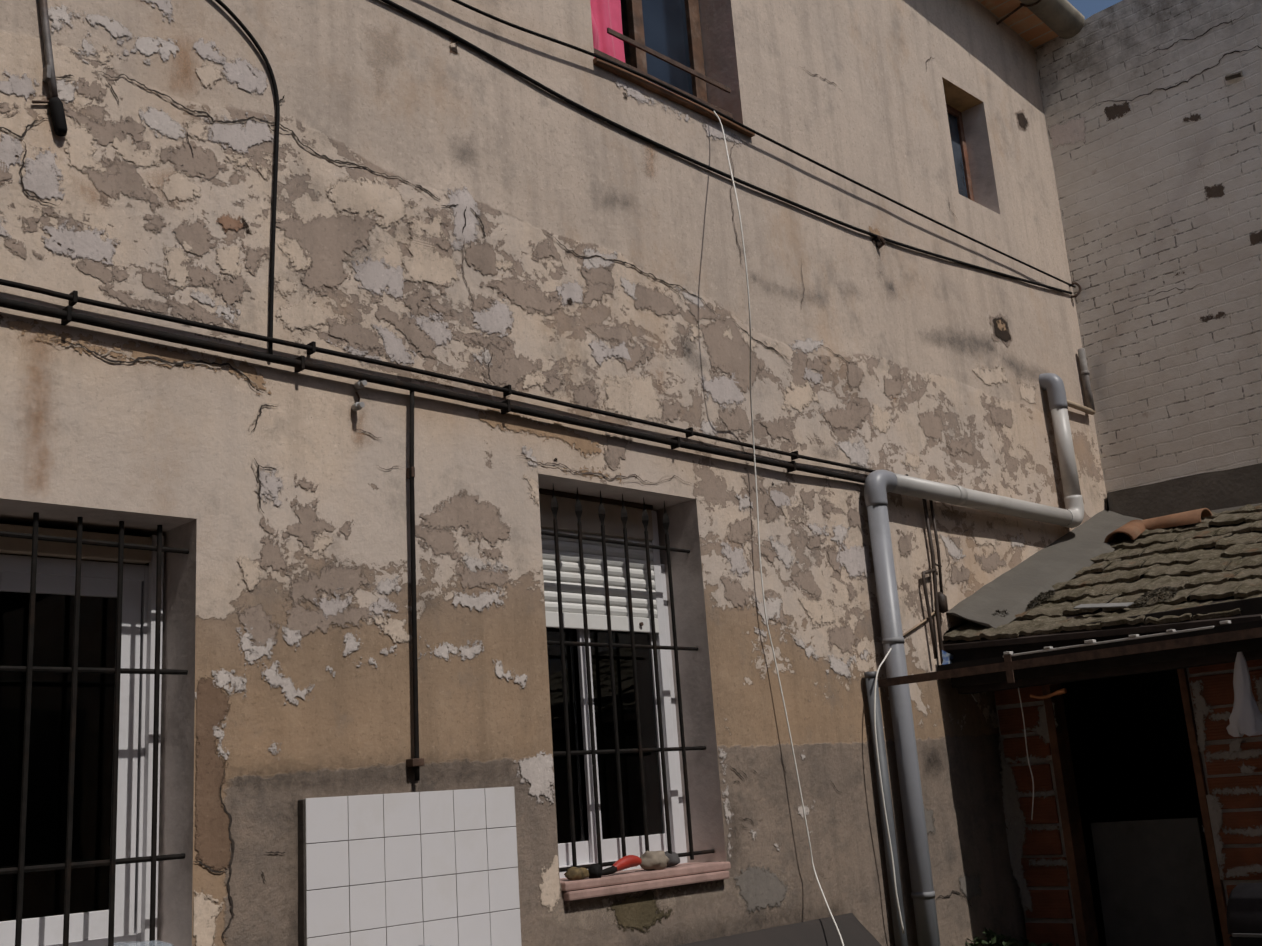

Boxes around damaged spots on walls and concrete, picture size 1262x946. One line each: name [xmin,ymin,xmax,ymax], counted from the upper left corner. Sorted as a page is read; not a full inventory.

crack [0,118,54,205]
crack [56,71,486,308]
peeling [0,0,904,506]
crack [547,233,792,366]
crack [730,141,742,265]
spalling [989,313,1013,347]
spalling [1014,109,1030,131]
crack [49,339,278,513]
peeling [234,464,528,706]
peeling [720,468,872,679]
peeling [896,529,913,557]
peeling [936,508,1025,589]